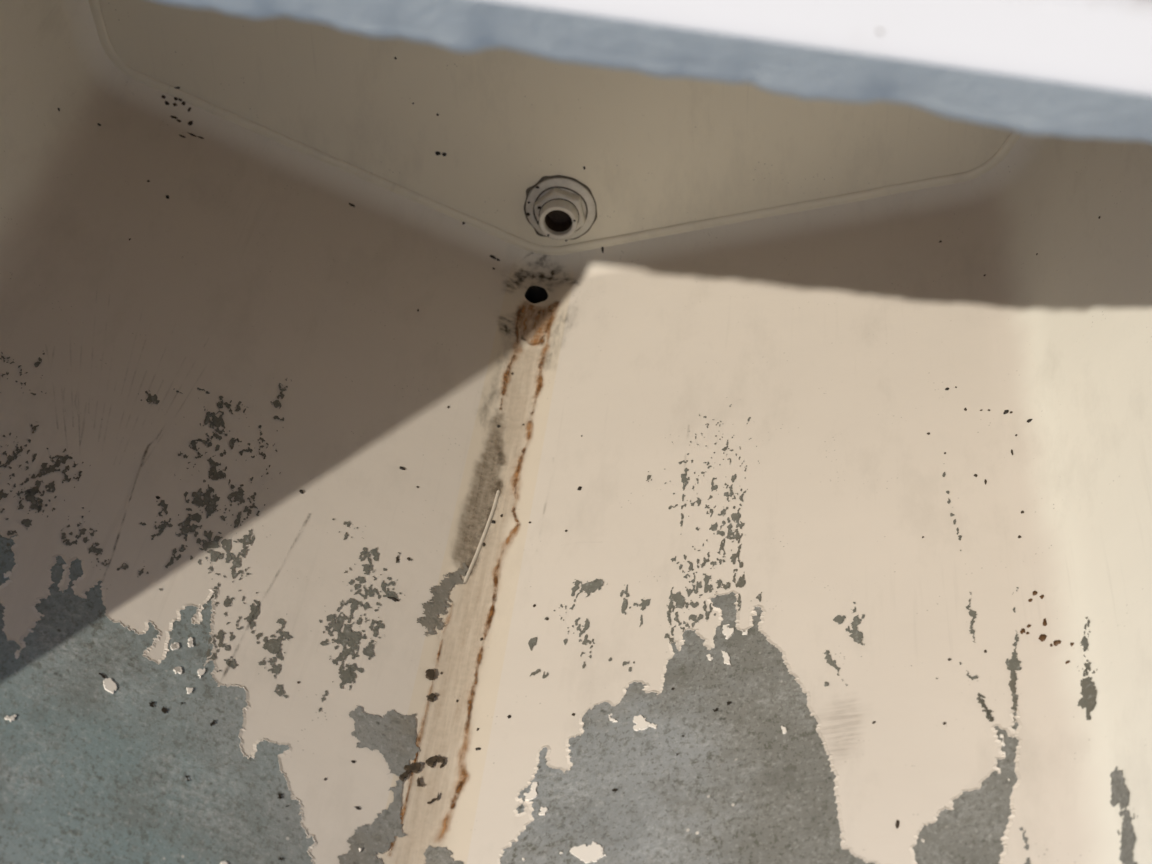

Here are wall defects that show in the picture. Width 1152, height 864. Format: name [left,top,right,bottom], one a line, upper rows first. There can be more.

rust [499,304,554,409]
leakage [456,418,501,570]
rust [513,412,533,487]
peeling [0,379,318,864]
peeling [310,518,412,712]
peeling [337,705,445,864]
peeling [416,563,469,636]
peeling [424,845,463,864]
rust [440,565,498,837]
peeling [497,415,888,864]
peeling [909,630,1030,864]
peeling [1110,766,1138,864]